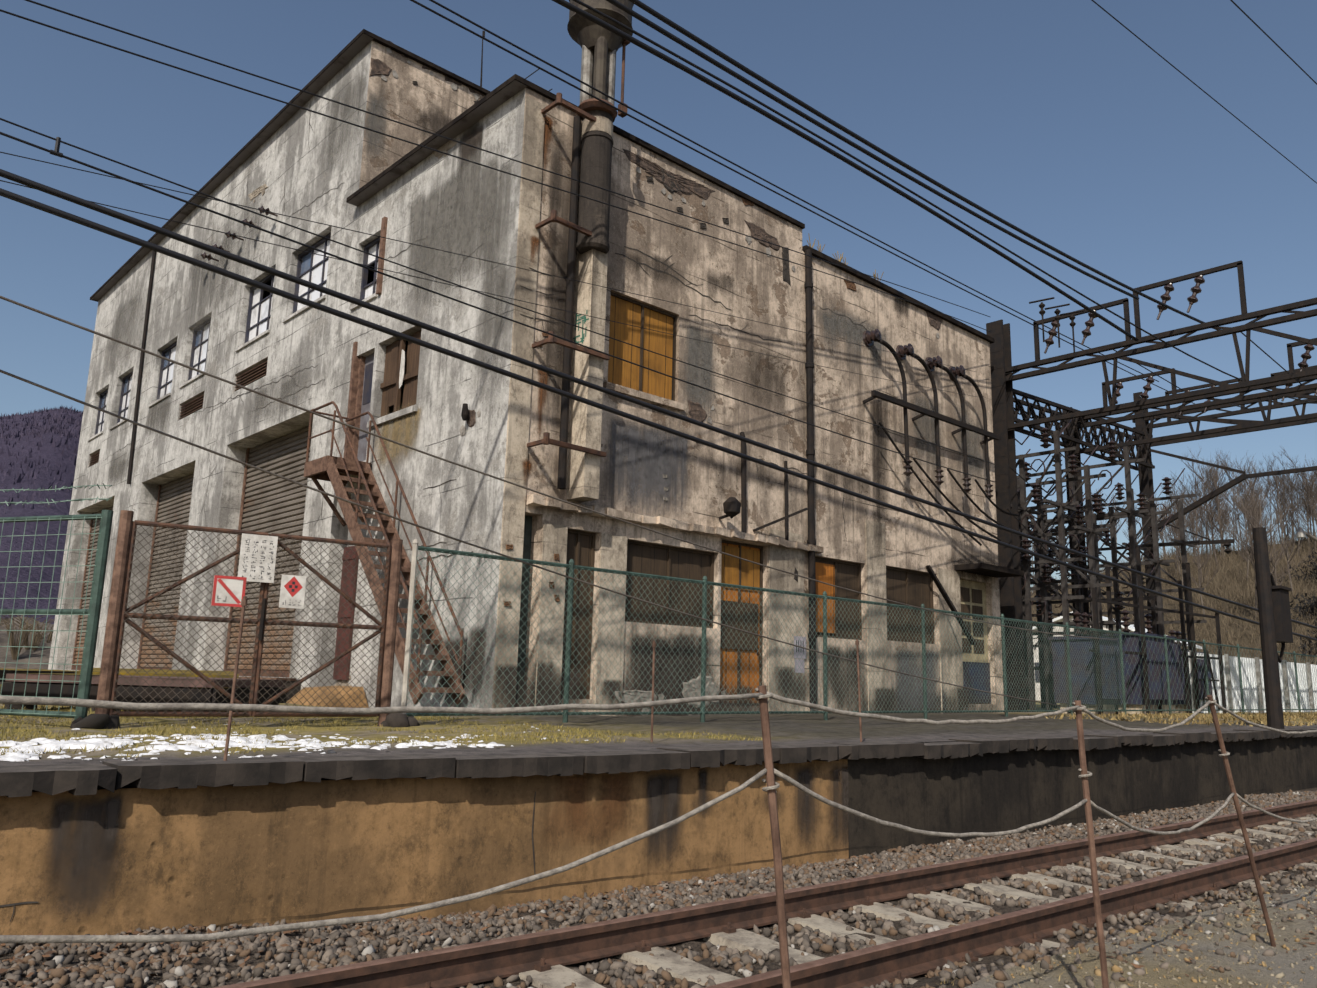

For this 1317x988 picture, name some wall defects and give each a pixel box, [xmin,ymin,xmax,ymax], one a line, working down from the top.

spalling [622,148,715,213]
spalling [722,197,796,286]
leakage [610,421,687,508]
leakage [647,775,680,848]
leakage [699,770,707,802]
leakage [797,768,812,828]
leakage [52,798,121,902]
crack [0,901,39,922]